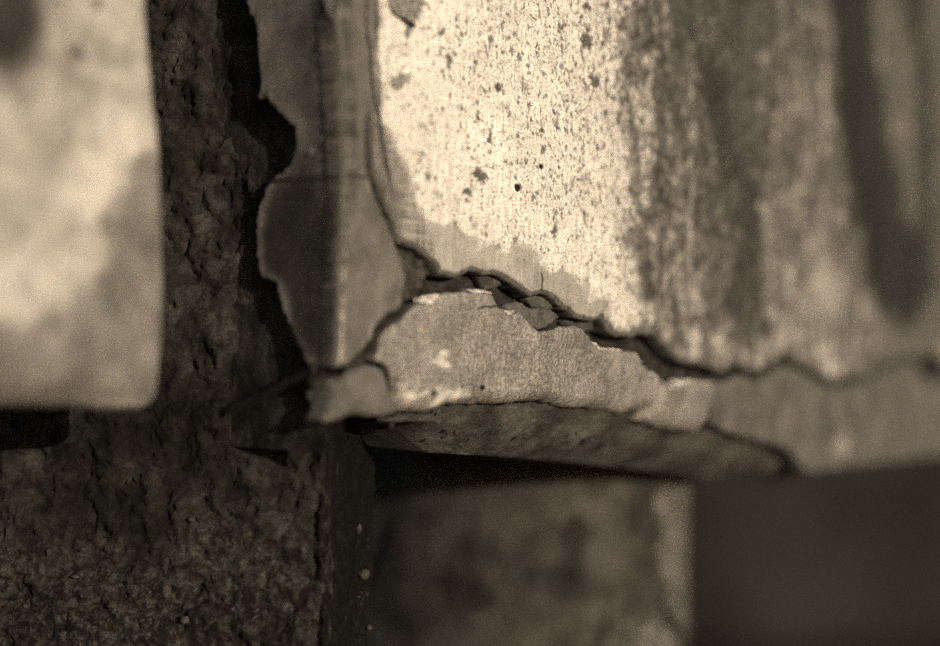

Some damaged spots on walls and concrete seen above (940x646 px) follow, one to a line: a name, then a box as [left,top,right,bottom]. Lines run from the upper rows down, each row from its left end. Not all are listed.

crack [377,246,780,383]
crack [227,350,373,415]
crack [880,357,940,380]